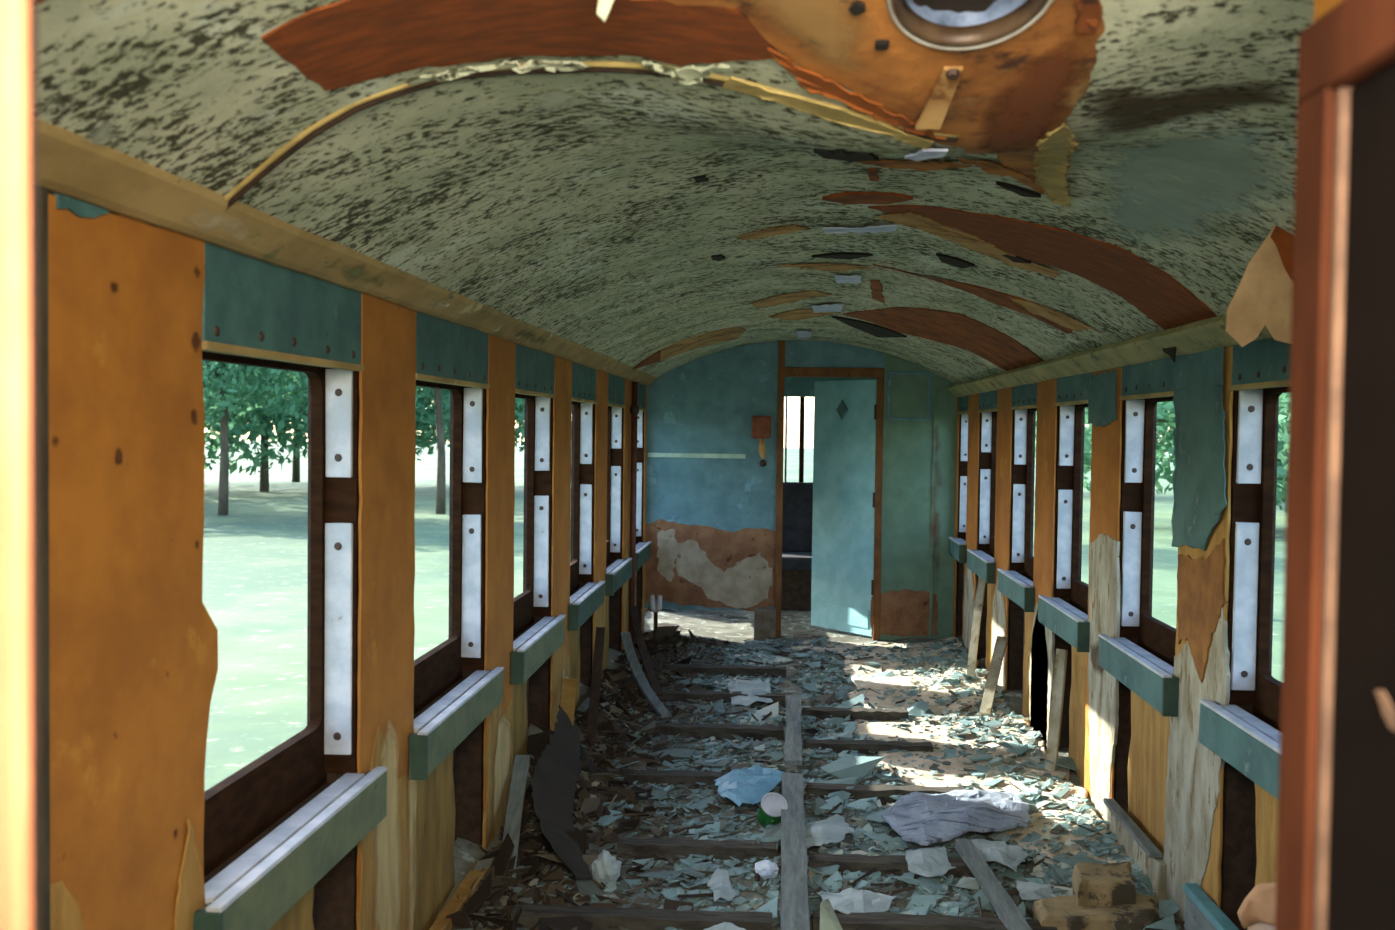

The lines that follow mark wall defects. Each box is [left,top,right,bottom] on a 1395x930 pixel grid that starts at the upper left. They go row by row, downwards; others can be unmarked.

peeling [261,0,779,91]
peeling [855,149,1031,182]
peeling [738,205,1217,330]
peeling [750,263,1094,371]
peeling [645,519,776,611]
peeling [1163,347,1231,921]
peeling [1375,690,1395,731]
peeling [50,881,86,930]
peeling [174,819,204,930]